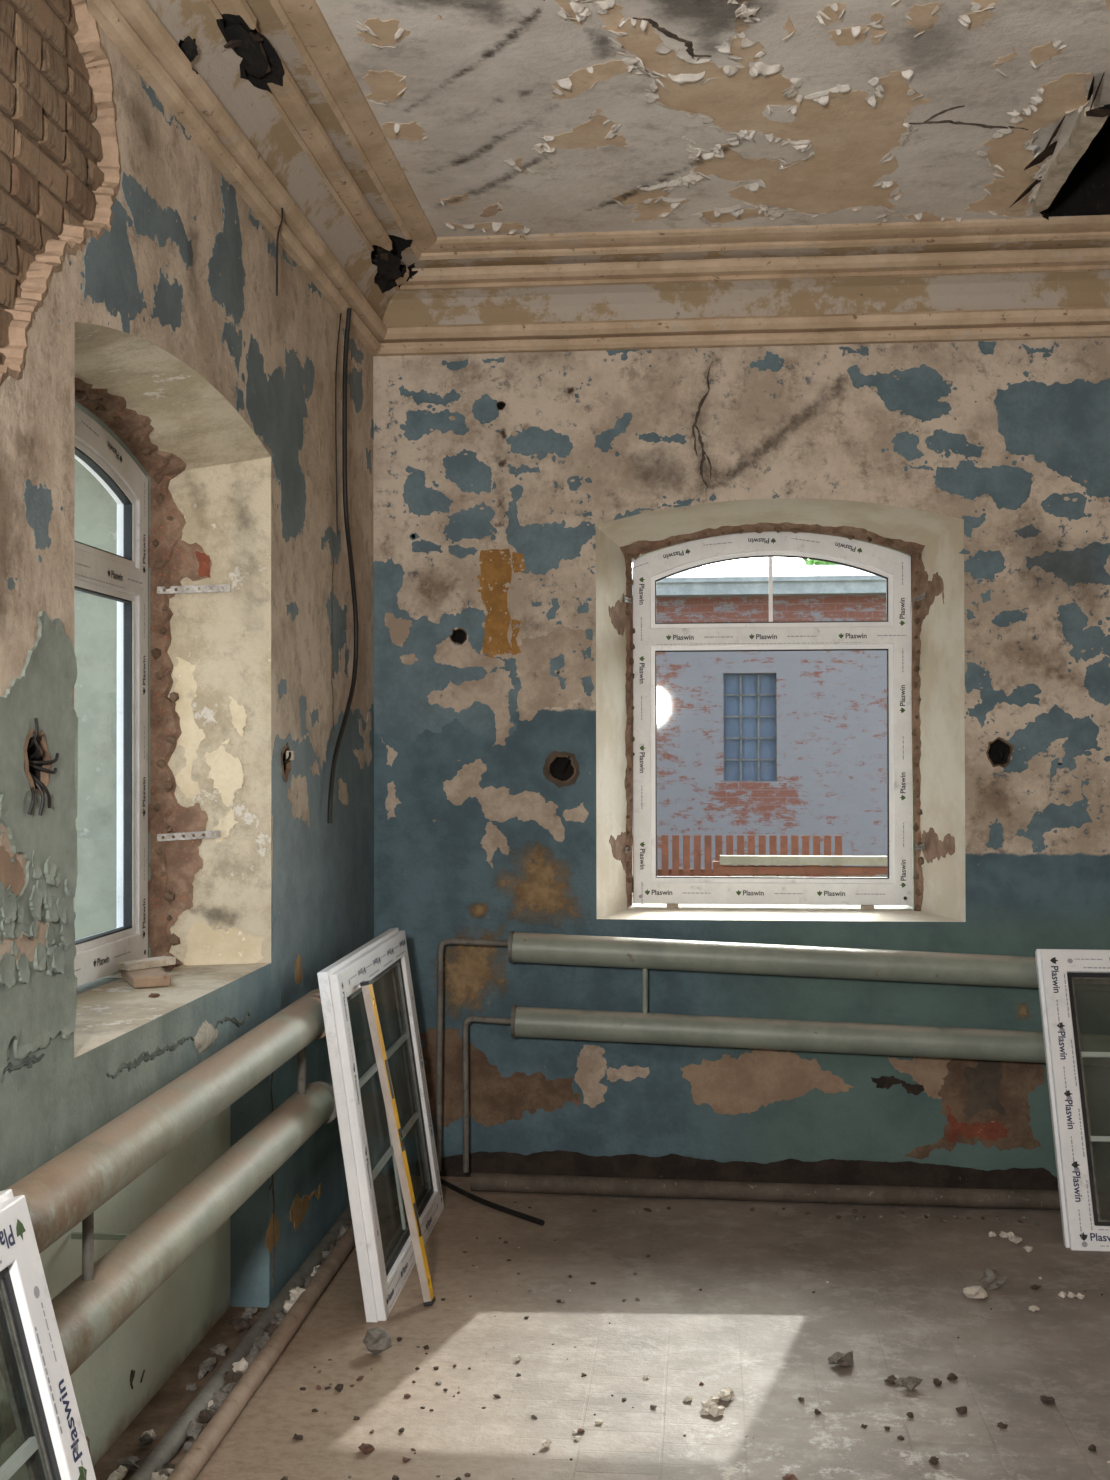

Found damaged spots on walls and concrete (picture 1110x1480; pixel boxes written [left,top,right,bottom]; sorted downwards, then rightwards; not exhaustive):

crack [633,17,711,61]
peeling [552,0,1104,227]
spalling [0,0,316,543]
peeling [23,477,63,562]
peeling [75,357,596,1009]
crack [692,361,713,501]
spalling [609,522,955,911]
peeling [839,341,1110,854]
peeling [0,611,78,1082]
spalling [420,1028,650,1127]
spalling [680,1049,854,1115]
spalling [871,1057,1045,1160]